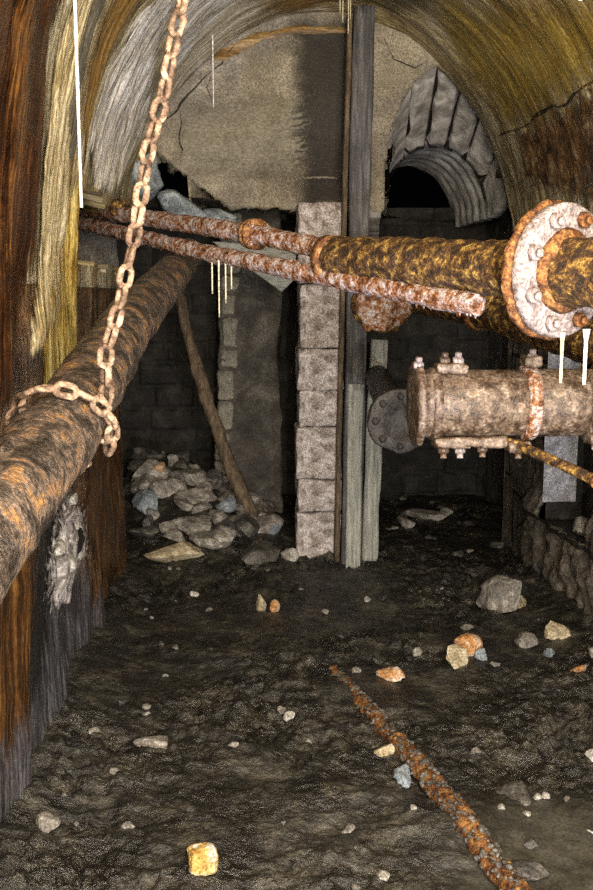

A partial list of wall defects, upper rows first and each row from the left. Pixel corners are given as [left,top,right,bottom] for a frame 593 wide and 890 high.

leakage [30,0,106,384]
leakage [89,0,353,205]
crack [500,81,593,141]
leakage [0,494,105,822]